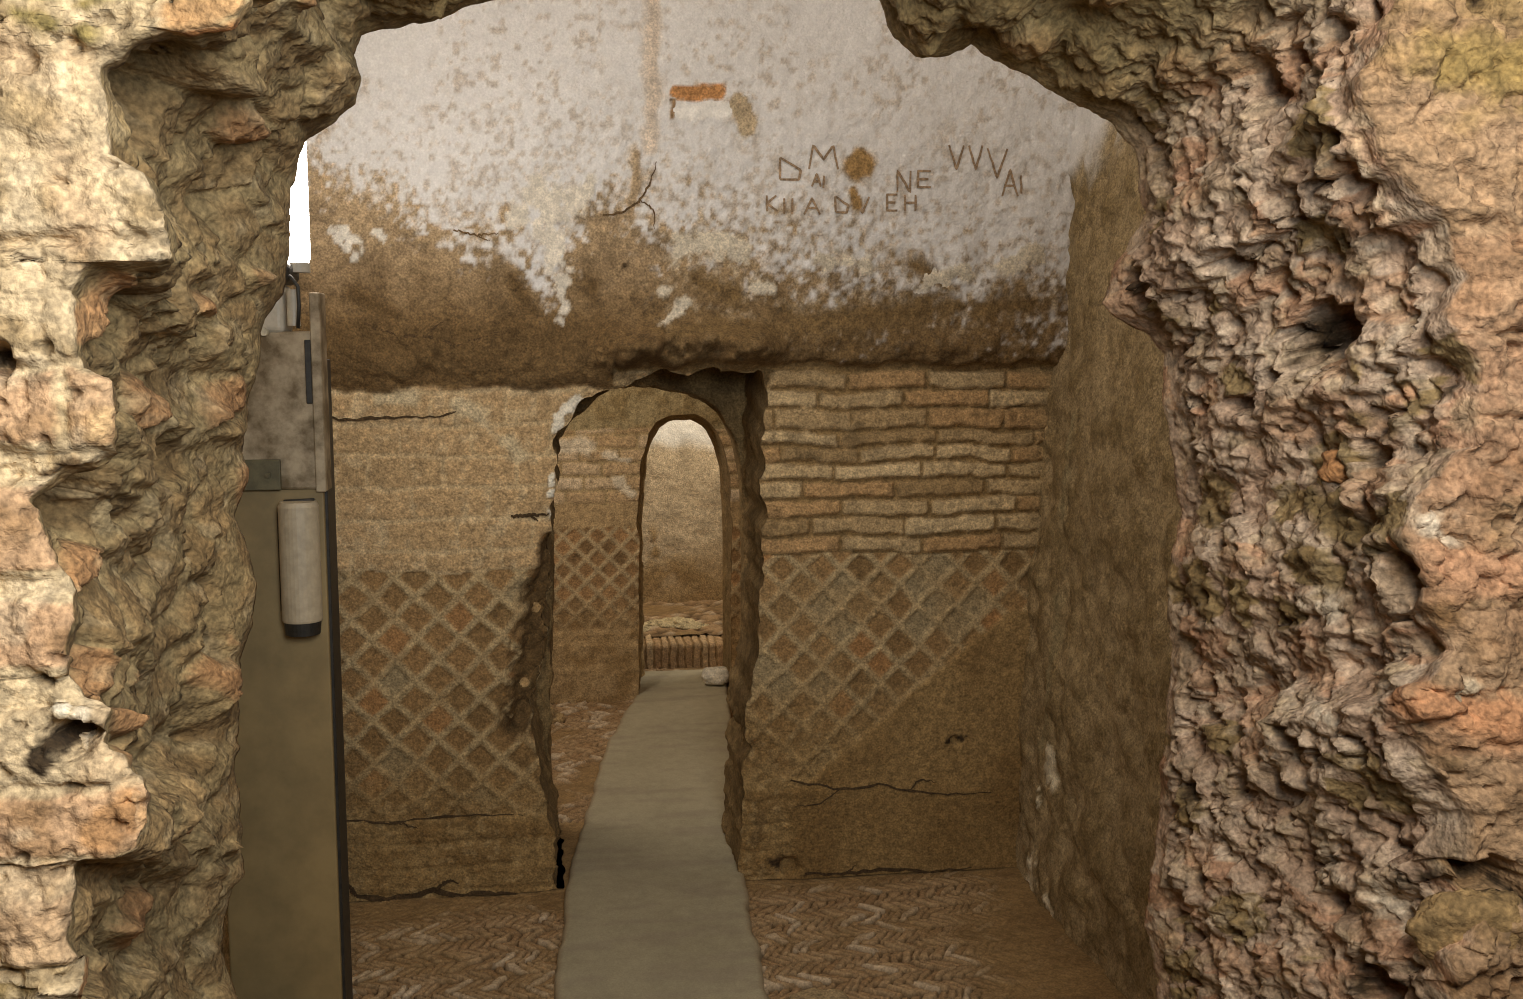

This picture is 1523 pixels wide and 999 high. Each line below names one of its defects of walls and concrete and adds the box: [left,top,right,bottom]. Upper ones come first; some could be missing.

spalling [668,81,761,141]
peeling [324,223,389,264]
peeling [501,152,600,328]
peeling [655,224,780,328]
peeling [810,244,876,279]
peeling [911,231,1048,294]
crack [790,779,991,807]
crack [349,879,516,902]